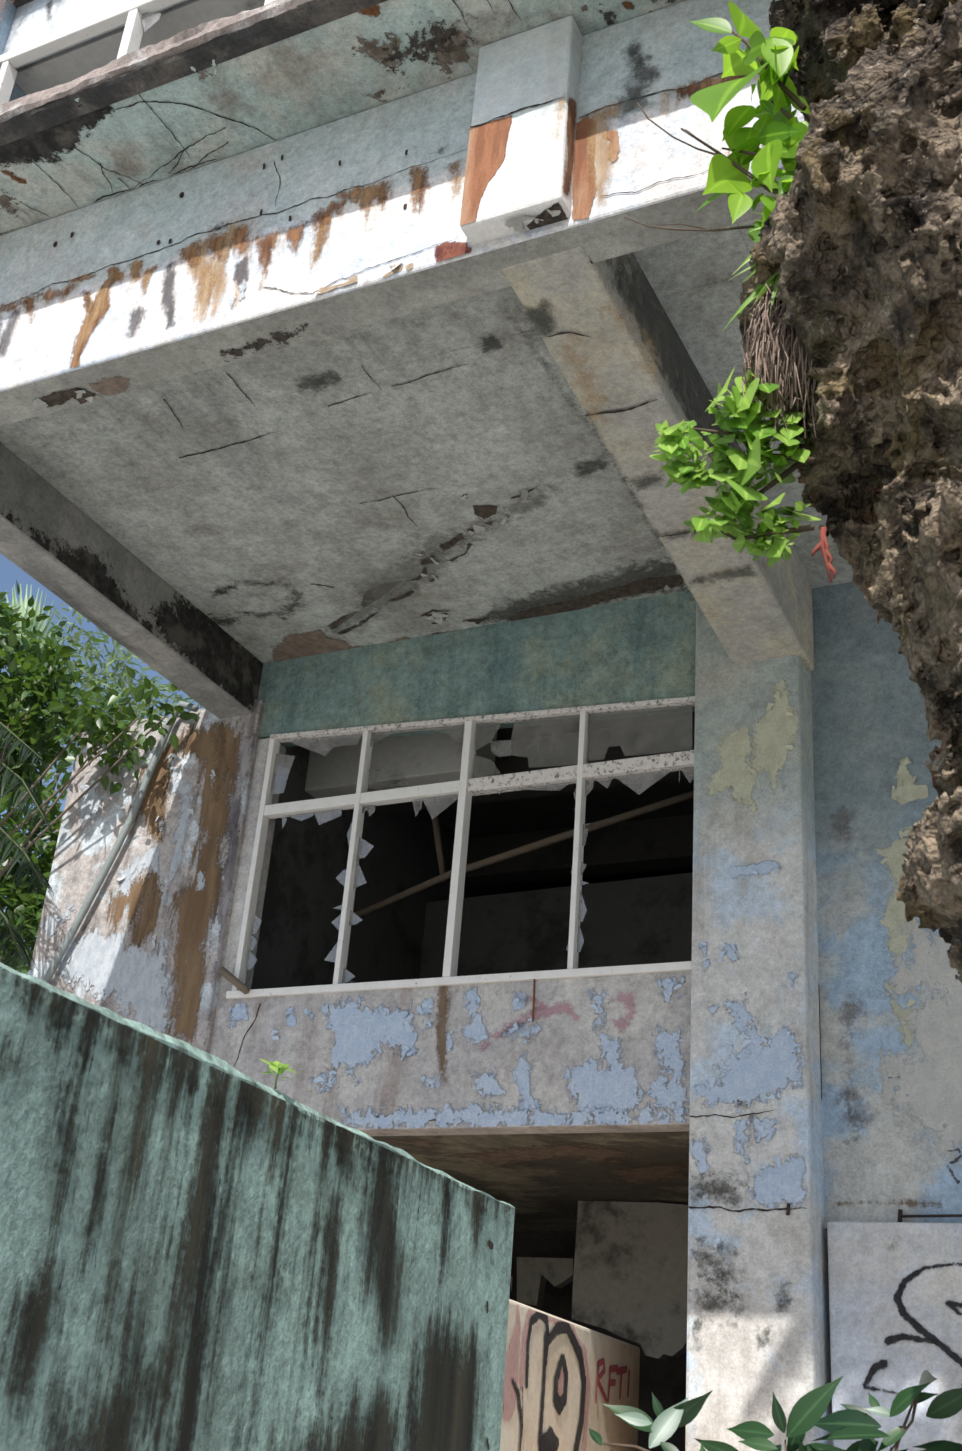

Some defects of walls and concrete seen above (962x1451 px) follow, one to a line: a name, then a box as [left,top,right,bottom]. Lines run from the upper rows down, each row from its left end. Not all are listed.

water stain [368,5,468,73]
corrosion [1,260,157,368]
crack [163,373,279,459]
corrosion [180,181,390,313]
crack [0,72,723,308]
crack [328,363,470,407]
corrosion [434,115,512,262]
water stain [1,485,552,712]
peeling [117,754,215,898]
peeling [38,898,179,1034]
peeling [270,987,808,1209]
water stain [0,968,514,1451]